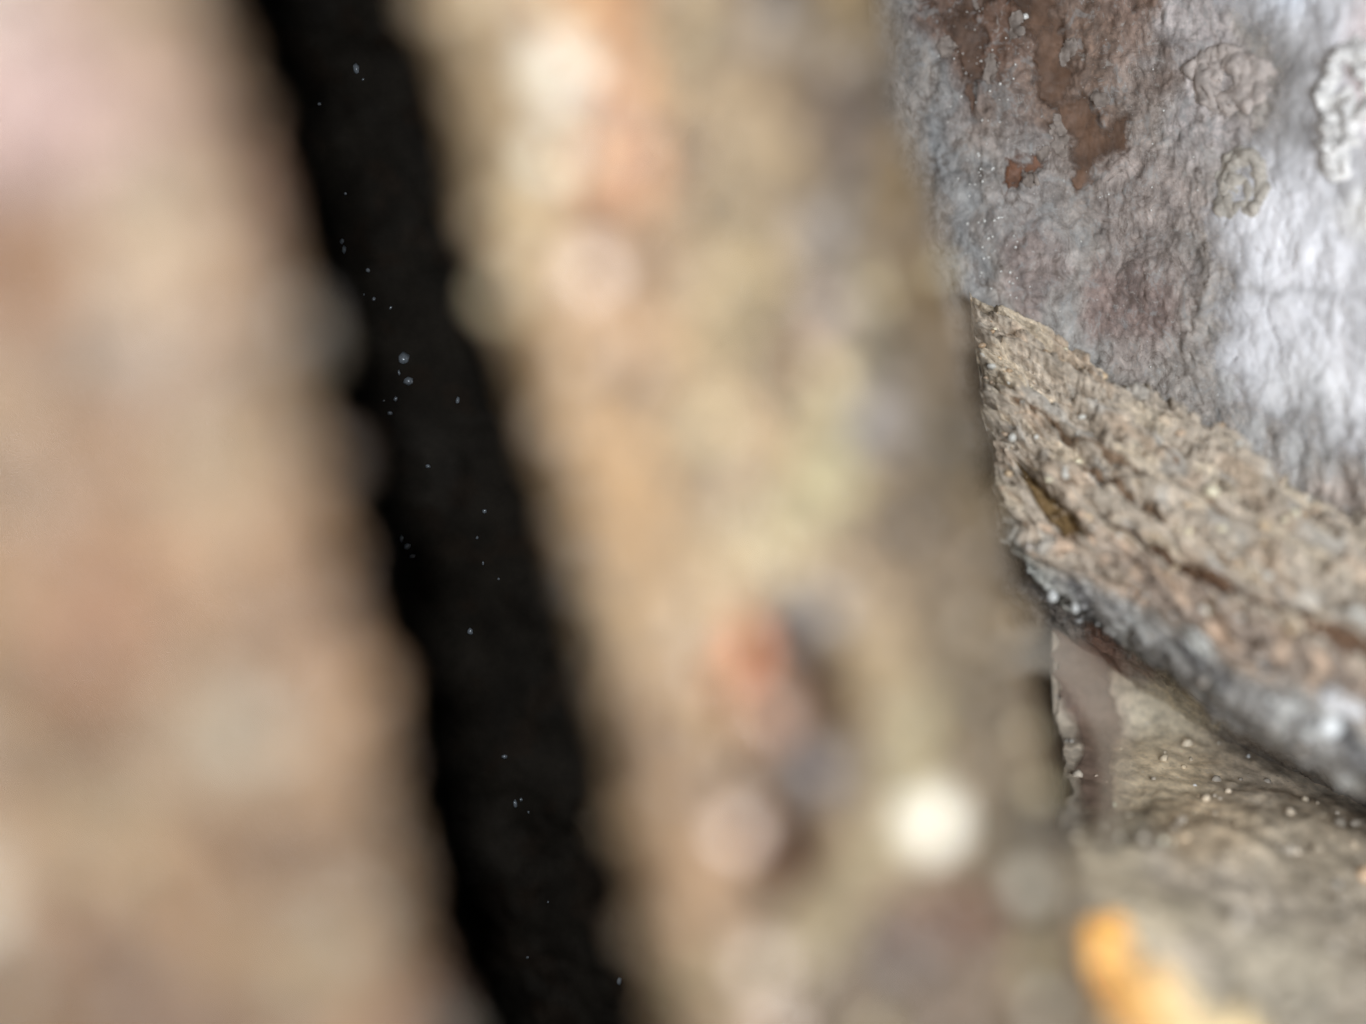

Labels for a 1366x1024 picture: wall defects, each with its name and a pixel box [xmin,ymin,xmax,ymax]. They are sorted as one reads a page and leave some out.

leakage [1217,0,1366,462]